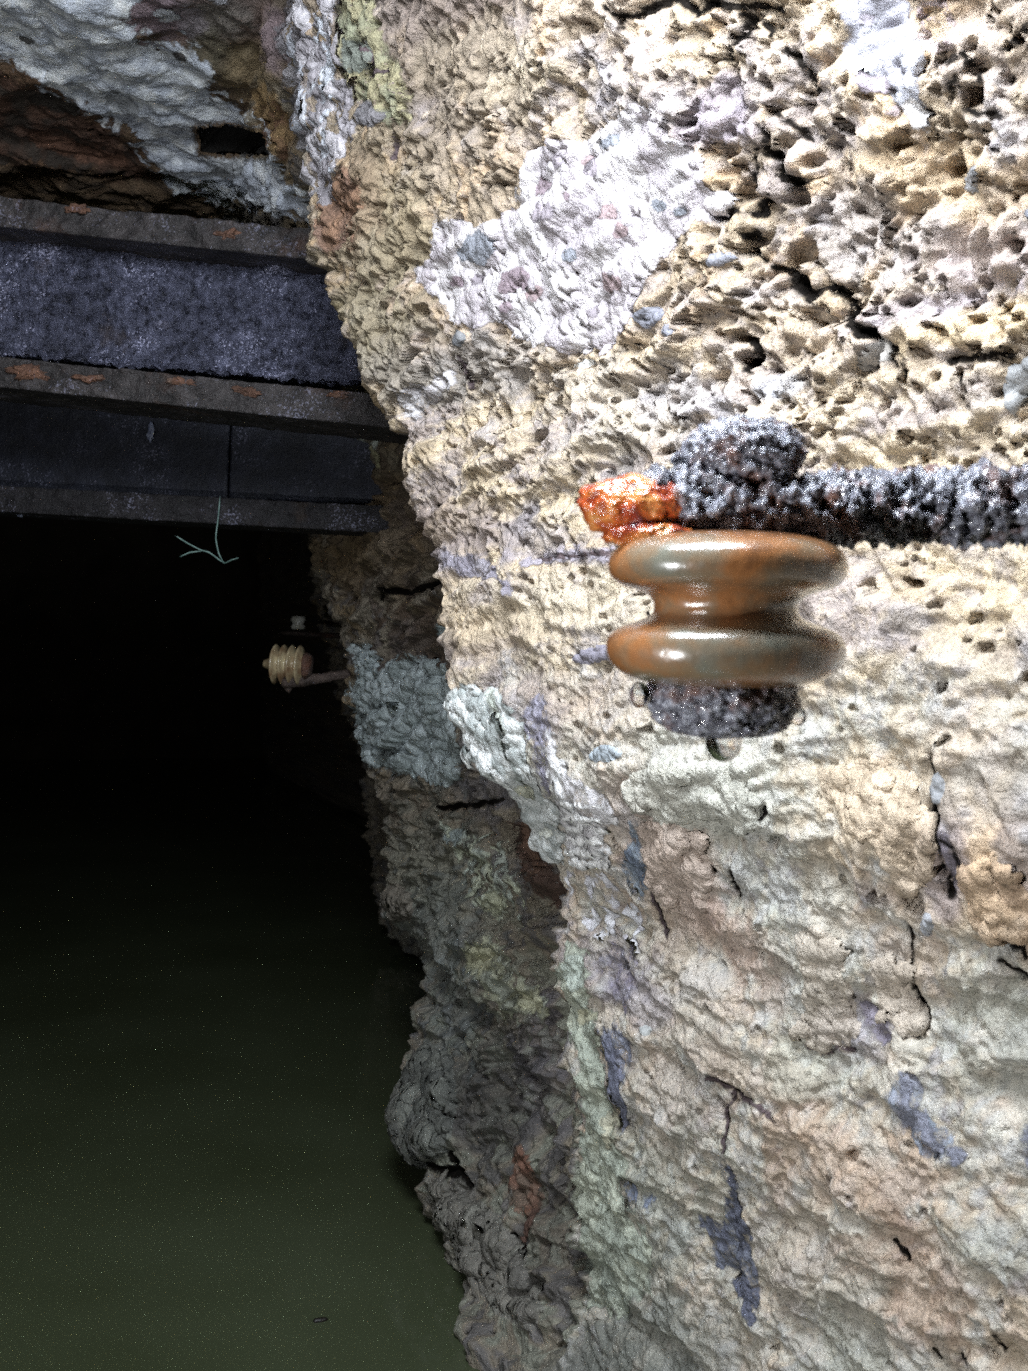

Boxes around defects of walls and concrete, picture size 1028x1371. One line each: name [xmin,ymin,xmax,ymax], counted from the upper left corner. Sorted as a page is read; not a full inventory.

crack [602,0,822,94]
spalling [414,103,738,356]
crack [700,109,908,377]
crack [375,580,441,601]
corrosion [601,523,694,545]
crack [928,753,958,899]
leakage [343,642,656,1320]
crack [902,925,930,1039]
crack [704,1076,775,1154]